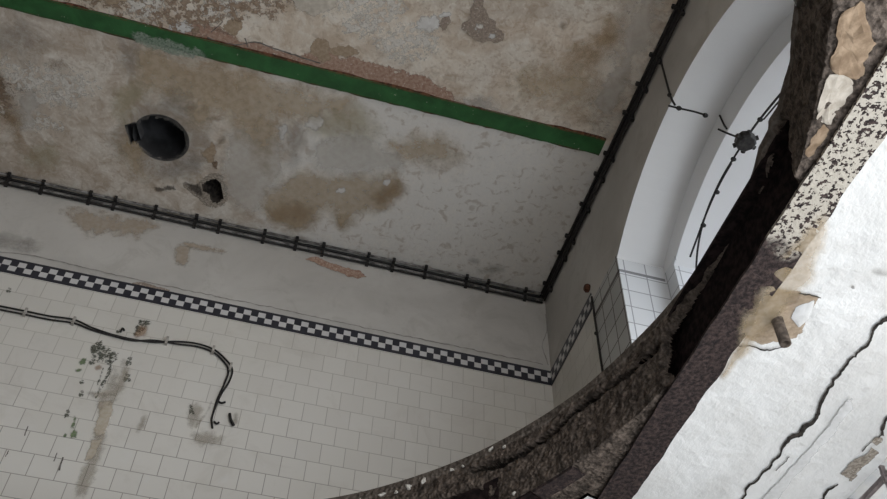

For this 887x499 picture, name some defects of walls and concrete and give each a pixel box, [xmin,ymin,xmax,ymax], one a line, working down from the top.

peeling [85,0,455,101]
peeling [461,0,504,43]
spalling [750,0,887,194]
damp [76,342,132,460]
peeling [306,257,366,279]
spalling [327,244,729,499]
crack [733,344,781,352]
spalling [745,289,818,345]
crack [742,316,887,499]
spalling [841,437,883,481]